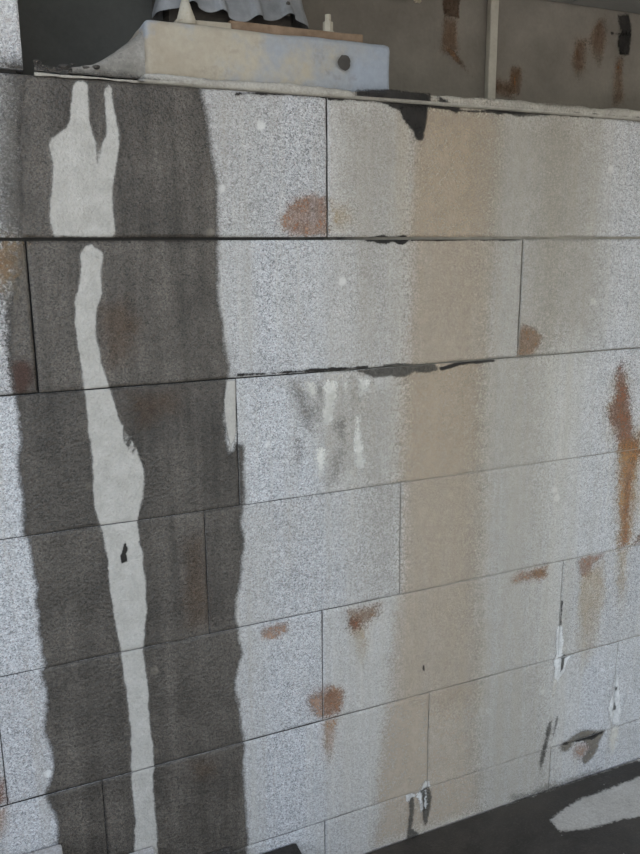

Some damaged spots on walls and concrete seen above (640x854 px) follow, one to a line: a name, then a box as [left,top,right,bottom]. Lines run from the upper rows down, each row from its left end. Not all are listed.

corrosion [443,0,464,67]
corrosion [280,195,338,237]
damp [3,59,519,854]
corrosion [609,366,640,554]
corrosion [347,603,379,629]
corrosion [306,685,344,742]
spalling [561,730,605,763]